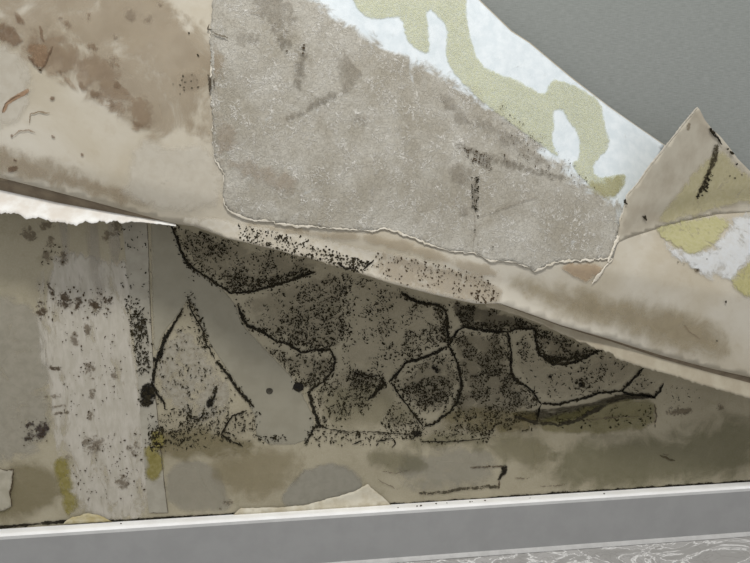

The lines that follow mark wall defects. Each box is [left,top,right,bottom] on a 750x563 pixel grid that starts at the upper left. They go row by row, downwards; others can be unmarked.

damp [0,0,218,133]
damp [20,222,68,267]
damp [20,418,49,446]
damp [36,283,113,355]
damp [55,261,286,514]
crack [137,226,664,448]
damp [176,225,658,447]
damp [568,296,718,349]